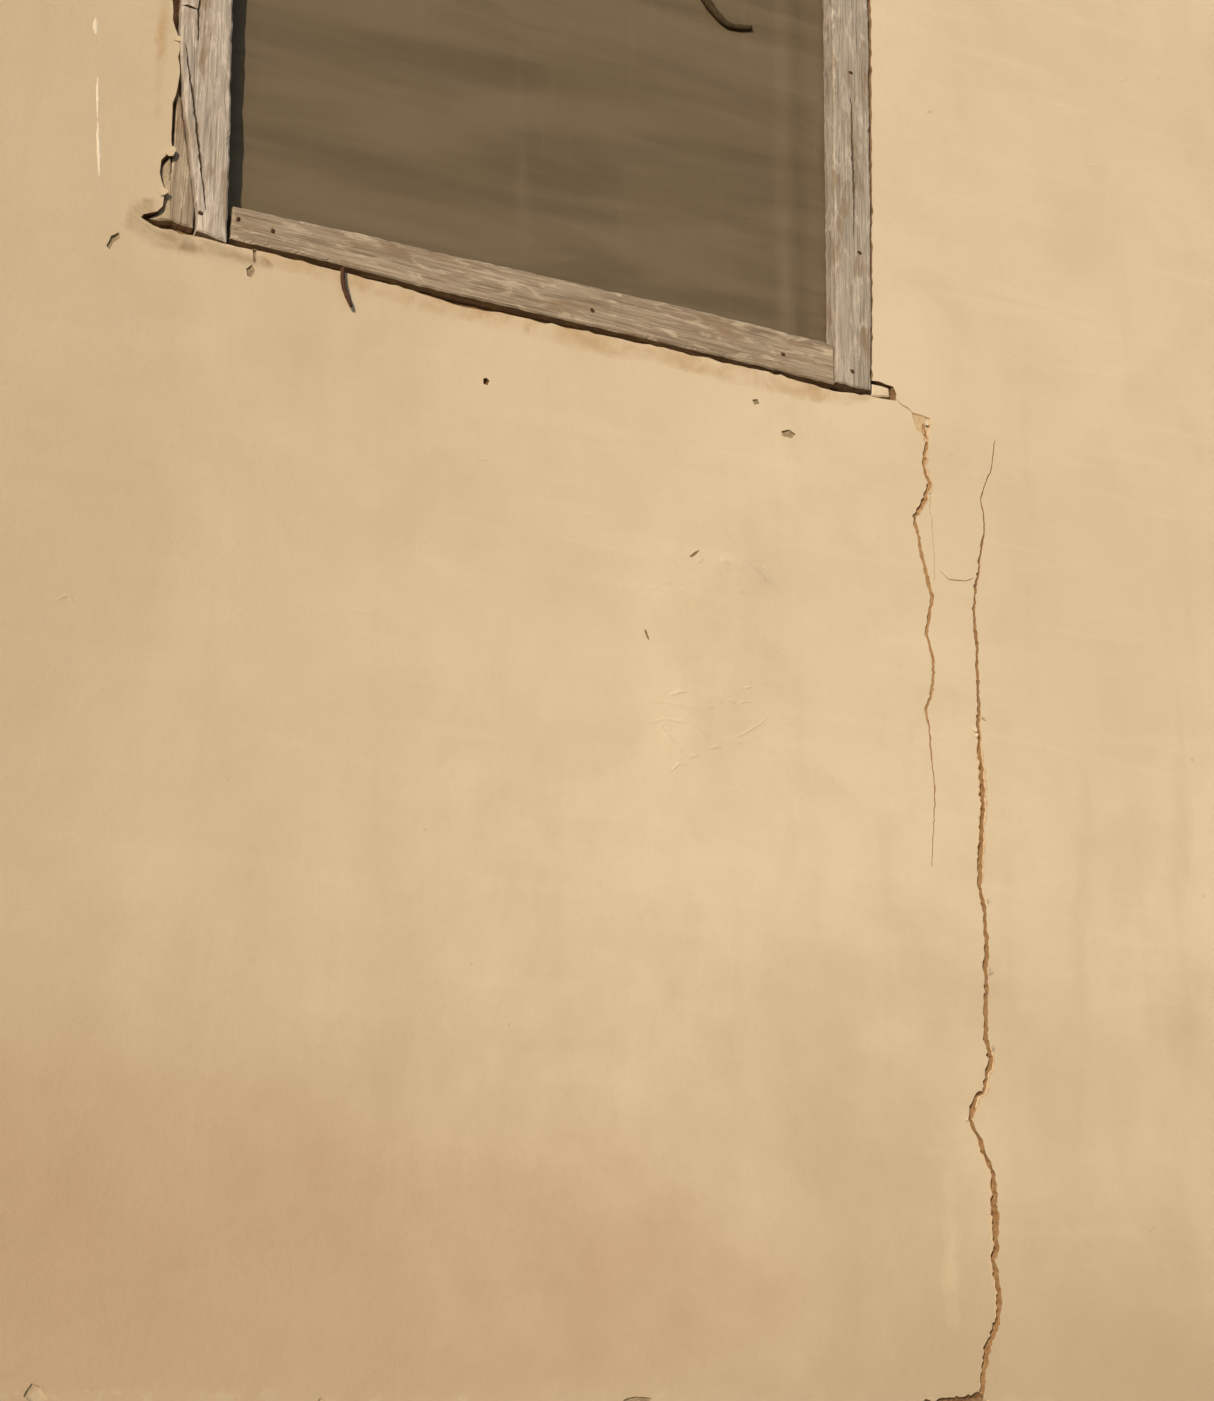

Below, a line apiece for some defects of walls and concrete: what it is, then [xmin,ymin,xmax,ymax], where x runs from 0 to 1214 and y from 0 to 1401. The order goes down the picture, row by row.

flaking render [141,0,193,236]
flaking render [365,278,658,347]
flaking render [828,0,896,401]
crack [896,399,1002,1401]